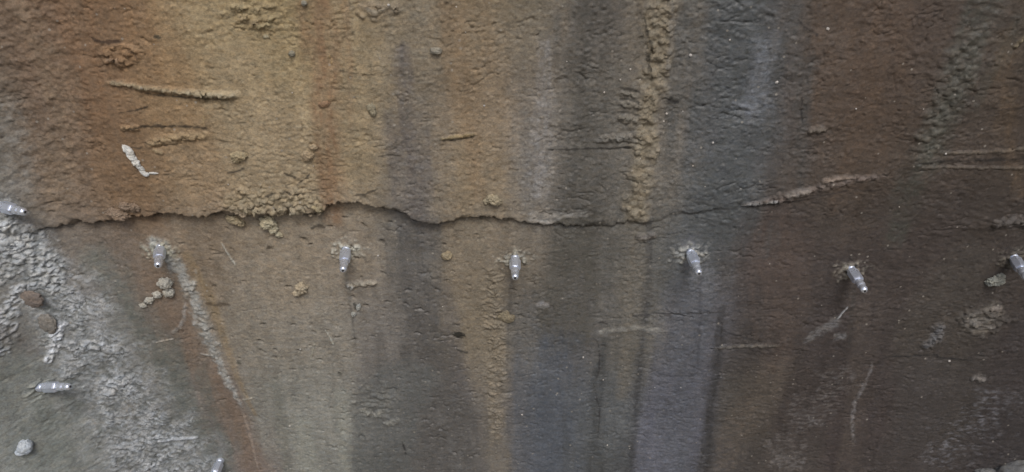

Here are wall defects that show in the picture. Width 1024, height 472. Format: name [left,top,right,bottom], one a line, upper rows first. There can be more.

leakage [0,94,262,472]
leakage [267,38,497,472]
crack [29,172,880,233]
crack [546,144,637,152]
leakage [506,0,821,472]